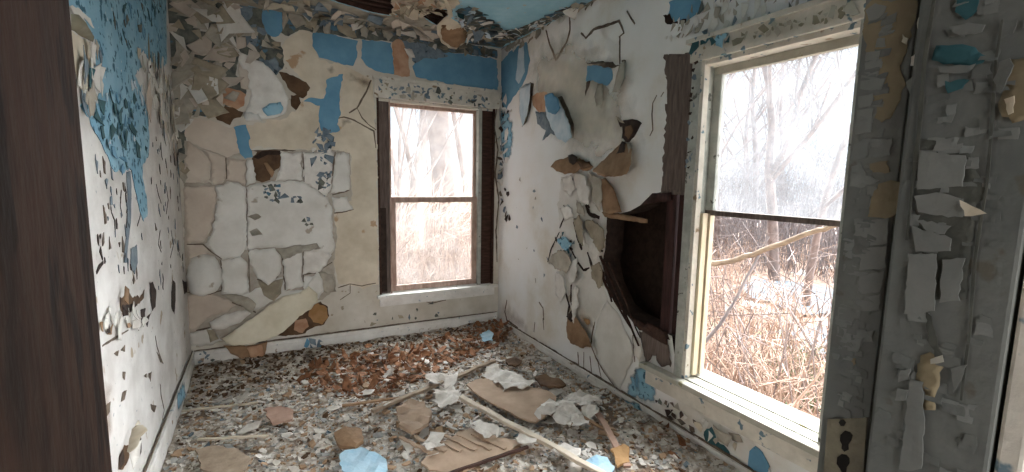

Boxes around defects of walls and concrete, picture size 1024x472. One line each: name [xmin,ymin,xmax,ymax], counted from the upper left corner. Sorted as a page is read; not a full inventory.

crack [545,2,635,64]
crack [338,80,376,148]
peeling [938,64,975,73]
peeling [993,58,1024,123]
flaking render [70,0,596,363]
flaking render [535,0,919,346]
peeling [895,138,987,471]
peeling [119,420,148,470]
peeling [655,398,743,450]